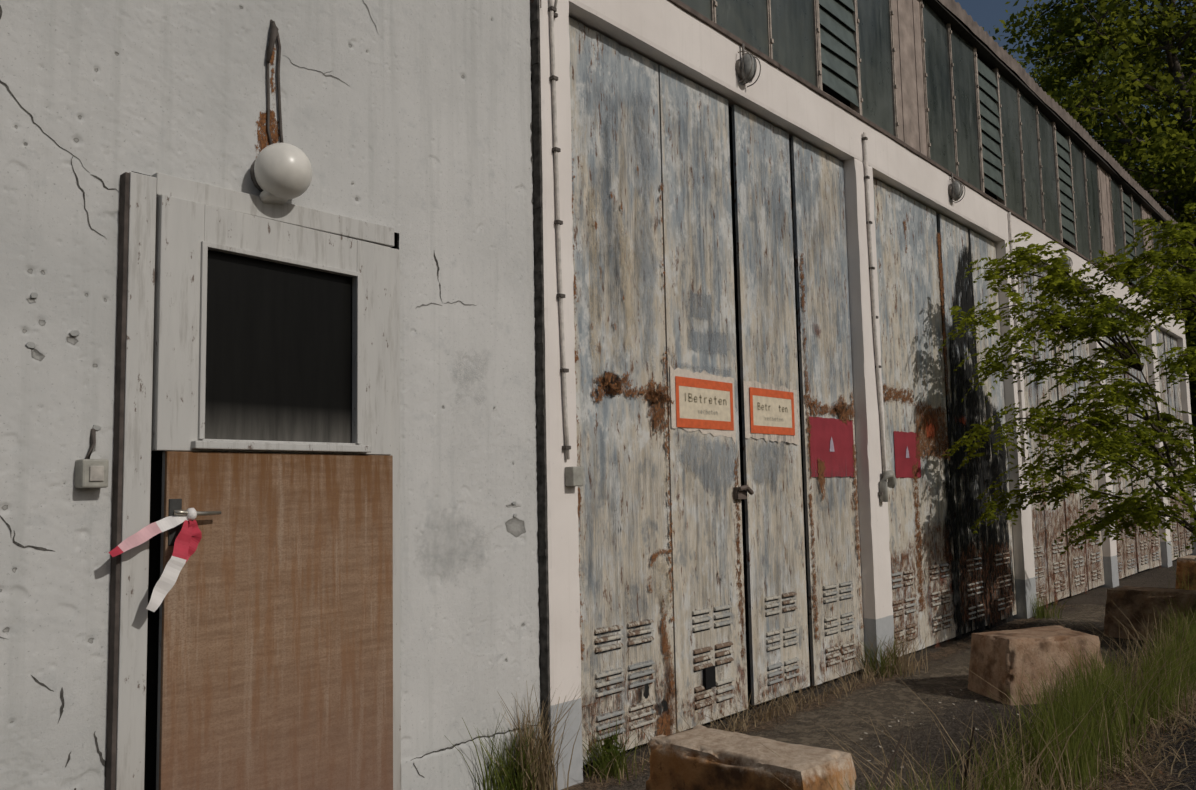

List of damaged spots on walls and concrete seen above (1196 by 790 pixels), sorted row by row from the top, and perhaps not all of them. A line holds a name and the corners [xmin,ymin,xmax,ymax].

corrosion [255,46,280,158]
crack [0,80,119,238]
crack [416,253,476,308]
corrosion [573,273,593,384]
corrosion [883,232,1015,653]
crack [0,516,53,551]
corrosion [582,254,864,754]
corrosion [1025,393,1192,608]
crack [31,675,64,722]
crack [65,732,106,777]